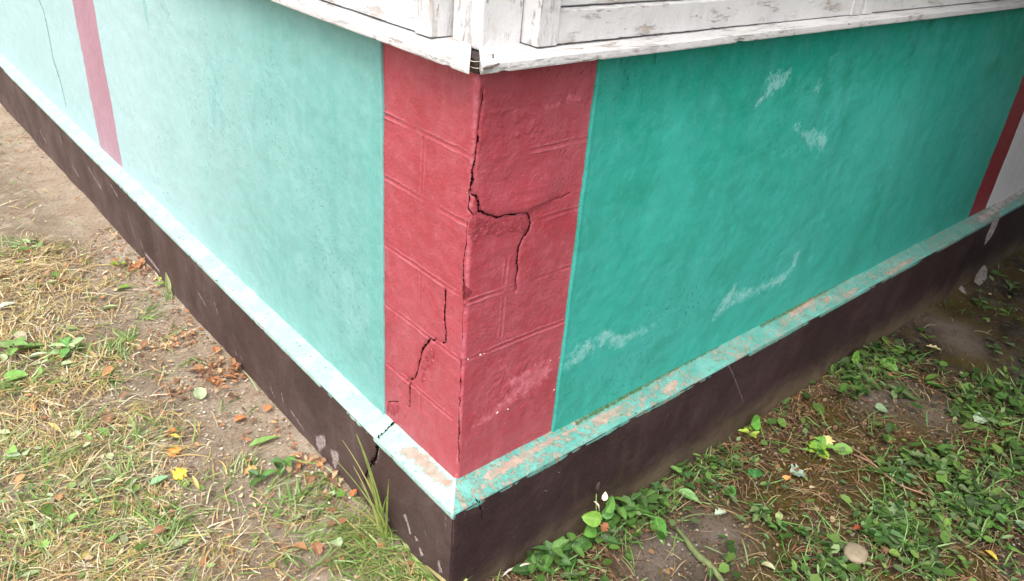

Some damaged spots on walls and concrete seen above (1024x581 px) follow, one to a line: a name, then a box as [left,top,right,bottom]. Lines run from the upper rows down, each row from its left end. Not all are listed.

crack [364,91,570,485]
spalling [462,285,472,306]
peeling [787,287,860,319]
peeling [663,380,678,393]
peeling [589,405,620,427]
peeling [483,426,578,485]